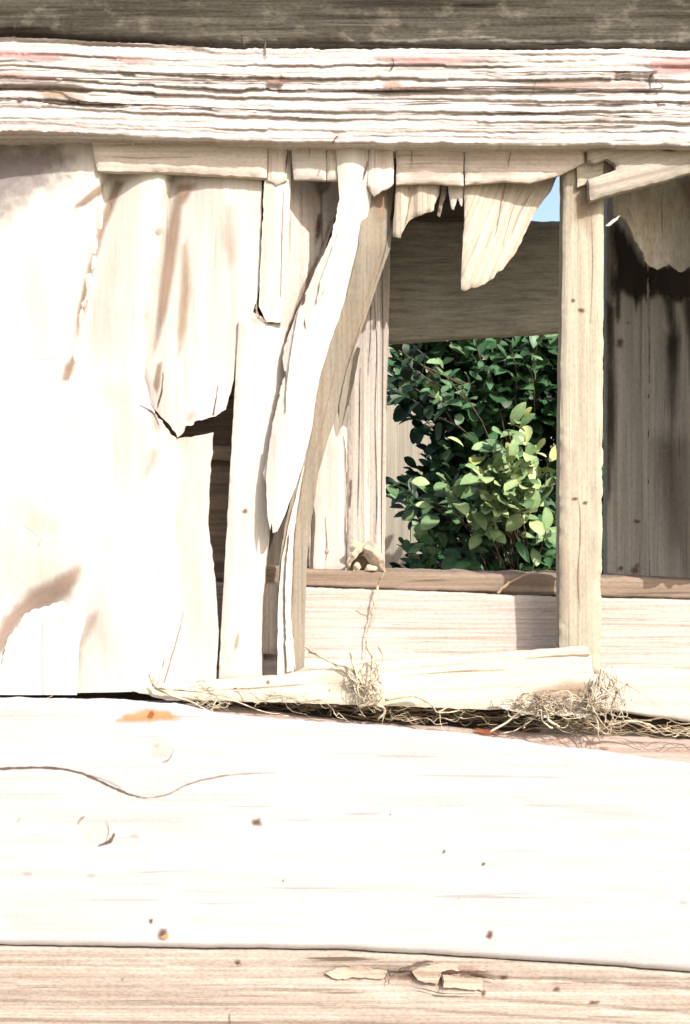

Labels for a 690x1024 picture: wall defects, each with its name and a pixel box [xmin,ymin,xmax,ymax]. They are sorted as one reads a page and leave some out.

peeling [286,303,306,411]
damp [606,222,690,493]
peeling [266,432,276,528]
corrosion [123,710,174,721]
crack [0,766,251,798]
spalling [326,960,495,994]